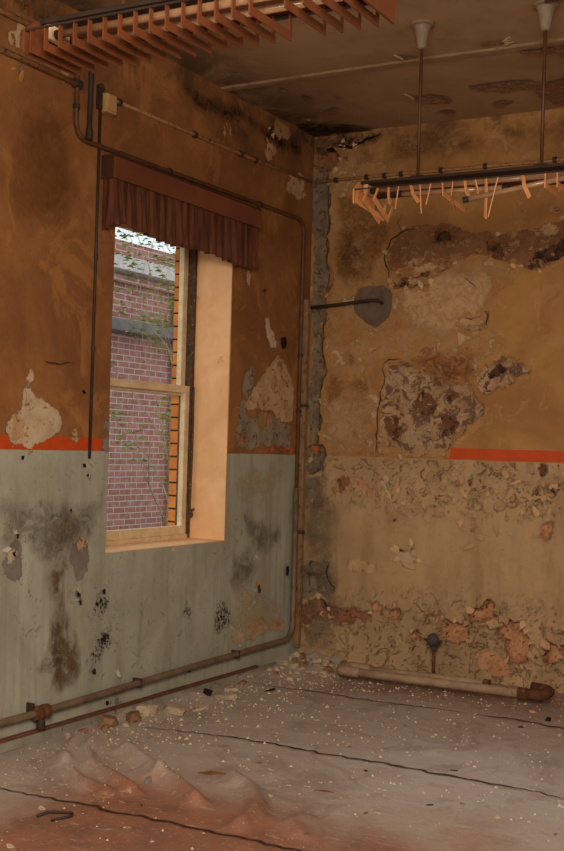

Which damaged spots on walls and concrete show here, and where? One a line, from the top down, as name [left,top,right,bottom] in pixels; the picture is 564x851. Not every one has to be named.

peeling [265,118,308,161]
flaking render [286,161,564,474]
peeling [2,525,26,582]
rust [52,619,78,688]
damp [91,631,111,674]
flaking render [436,594,564,678]
crack [148,727,564,799]
crack [1,788,304,851]